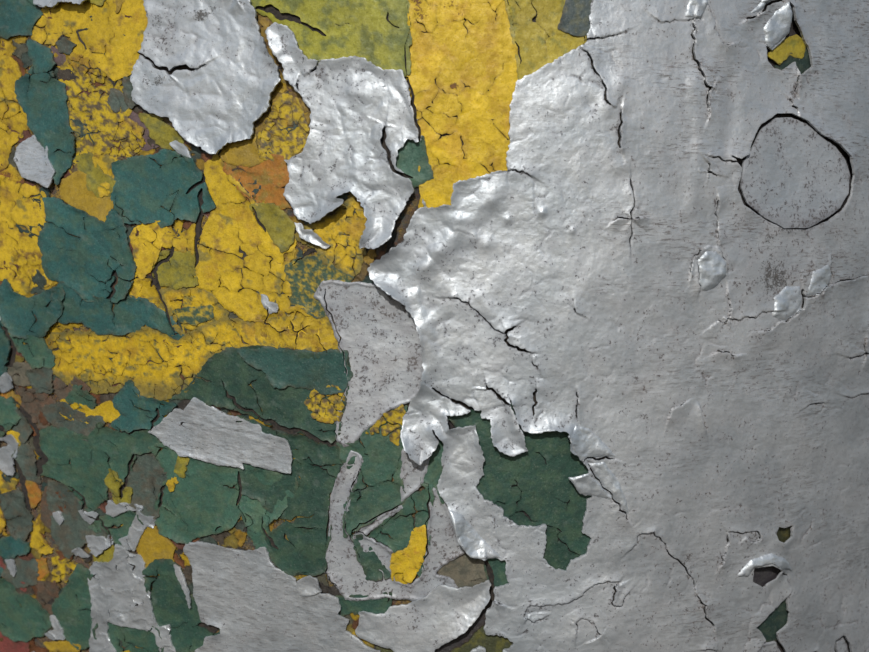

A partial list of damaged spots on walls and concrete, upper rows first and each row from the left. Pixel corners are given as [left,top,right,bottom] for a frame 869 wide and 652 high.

crack [584,35,622,148]
crack [688,20,711,108]
peeling [767,34,811,82]
peeling [0,0,599,652]
crack [653,532,713,625]
peeling [753,566,781,587]
peeling [776,526,792,542]
peeling [757,599,788,652]